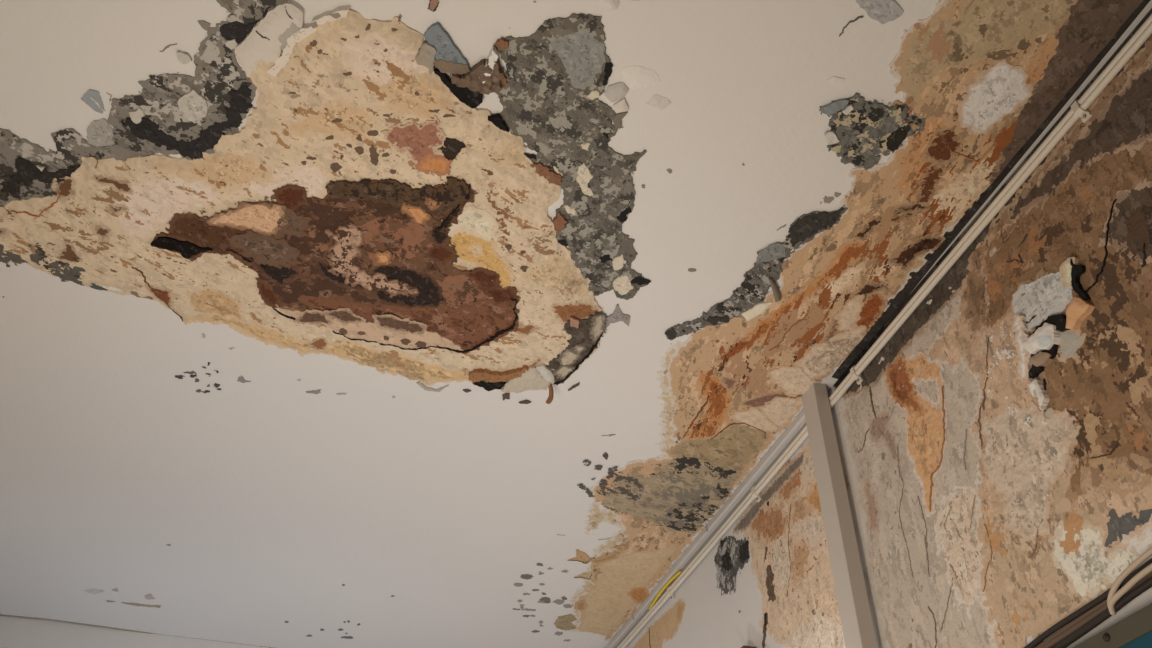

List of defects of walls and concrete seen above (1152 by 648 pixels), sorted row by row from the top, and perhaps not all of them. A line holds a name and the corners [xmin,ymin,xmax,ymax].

peeling [235,0,350,77]
spalling [415,0,651,329]
spalling [150,130,529,354]
rust [449,232,515,289]
peeling [463,363,554,404]
water stain [546,310,607,385]
water stain [568,0,1152,648]
crack [858,374,876,453]
rust [885,351,948,517]
crack [897,337,993,648]
peeling [1012,257,1095,411]
crack [1086,199,1117,292]